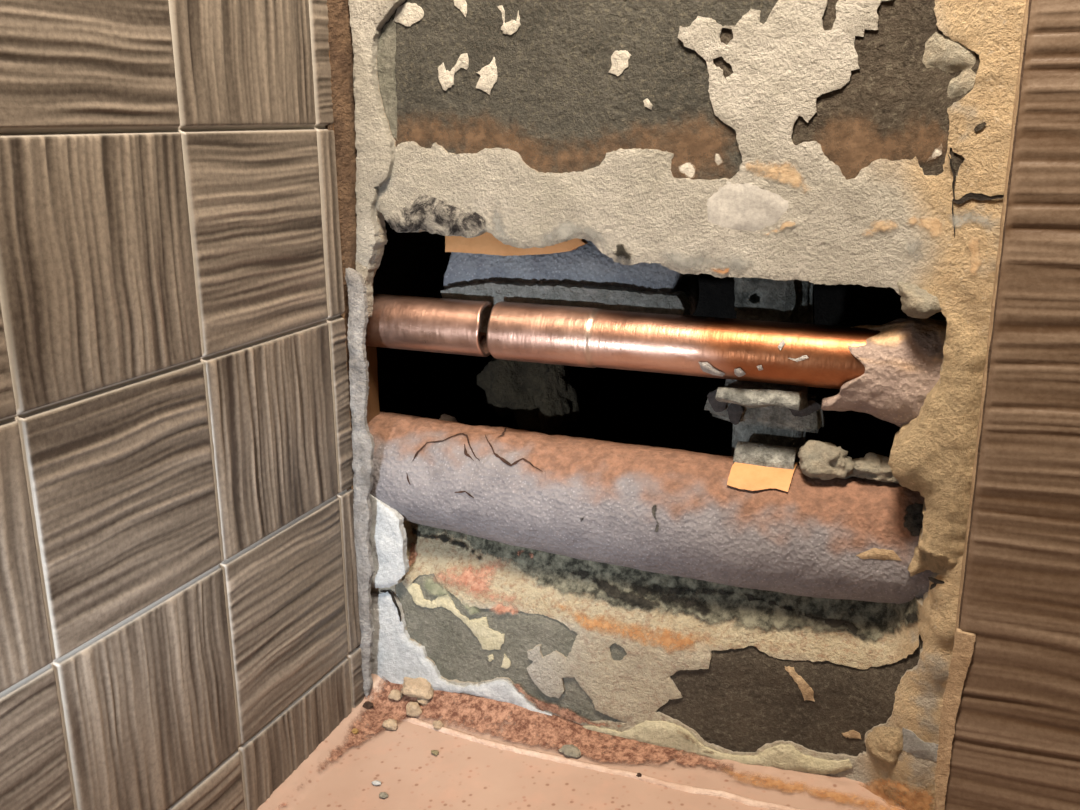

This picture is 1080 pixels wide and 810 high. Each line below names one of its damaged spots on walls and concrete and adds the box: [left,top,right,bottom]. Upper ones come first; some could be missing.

flaking render [385,194,486,238]
flaking render [377,0,778,180]
damp [746,163,802,187]
flaking render [792,0,980,180]
damp [411,524,919,641]
flaking render [370,573,923,775]